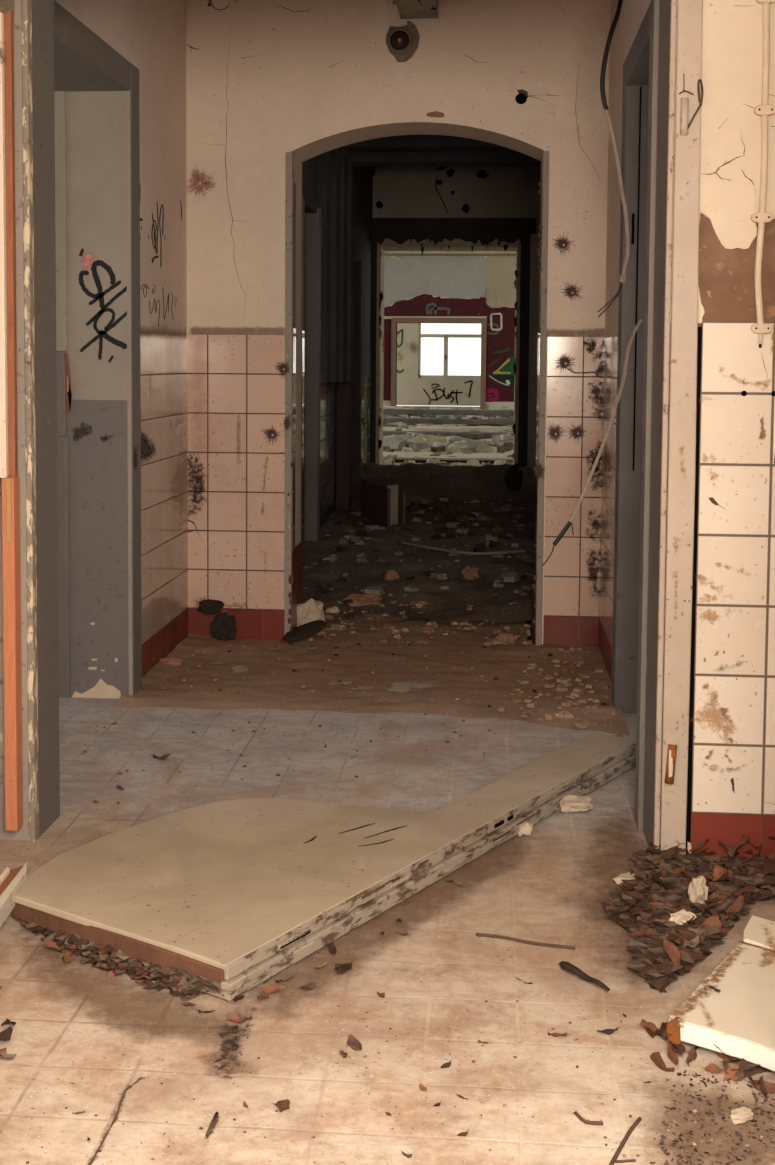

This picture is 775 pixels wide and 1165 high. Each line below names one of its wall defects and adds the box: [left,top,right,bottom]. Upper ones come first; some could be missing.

crack [707,94,775,185]
flaking render [698,186,775,324]
peeling [72,658,121,699]
crack [88,1077,144,1165]